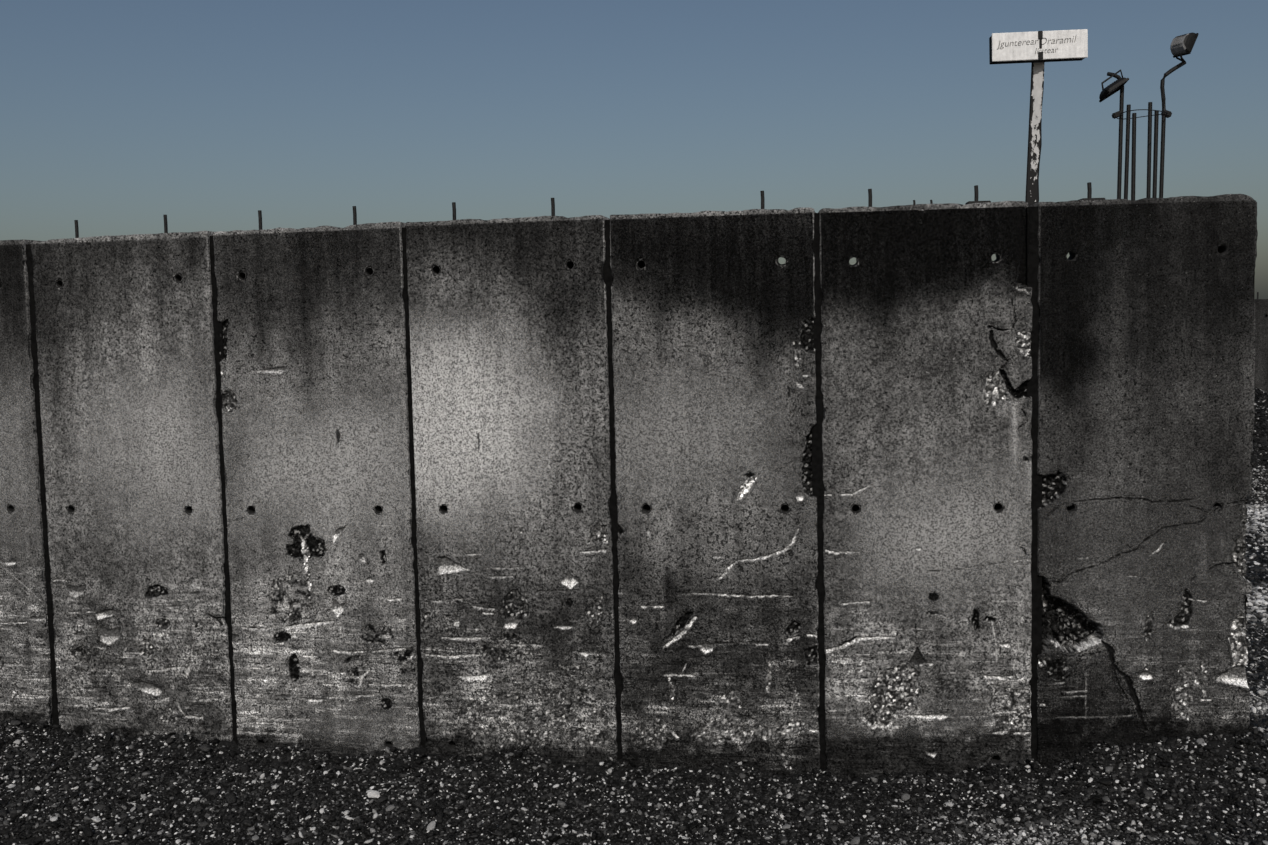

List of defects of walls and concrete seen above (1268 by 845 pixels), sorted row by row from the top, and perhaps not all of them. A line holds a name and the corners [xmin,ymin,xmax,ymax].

crack [985,289,1019,371]
spalling [266,520,352,705]
spalling [355,548,389,586]
crack [926,494,1220,586]
spalling [1039,573,1107,683]
crack [1188,554,1238,583]
spalling [989,682,1030,738]
crack [1050,636,1149,735]